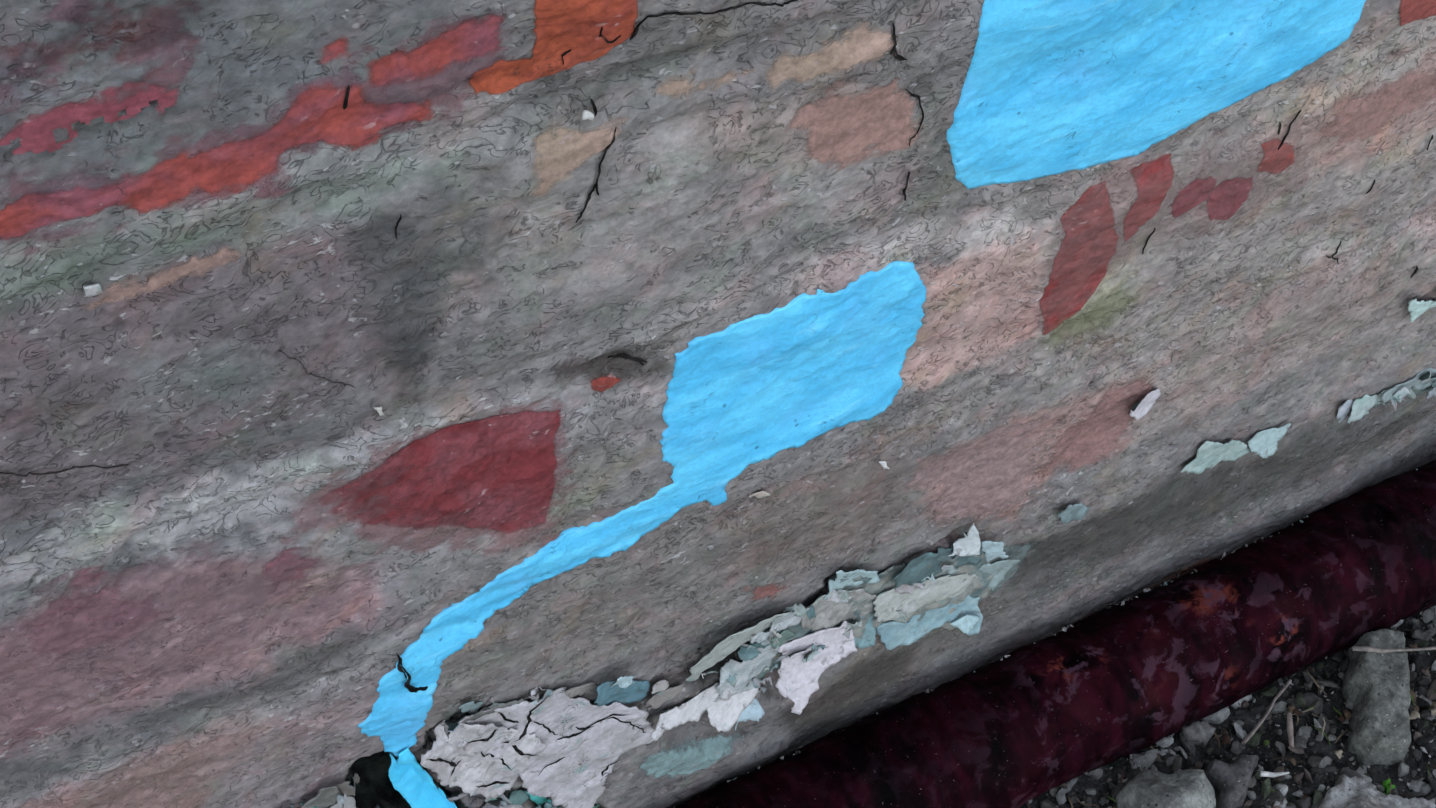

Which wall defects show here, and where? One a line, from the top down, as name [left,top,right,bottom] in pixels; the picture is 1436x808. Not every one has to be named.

crack [576,98,617,223]
crack [890,22,924,201]
peeling [1407,298,1436,322]
peeling [1180,423,1291,474]
peeling [1336,367,1436,424]
peeling [289,523,1020,808]